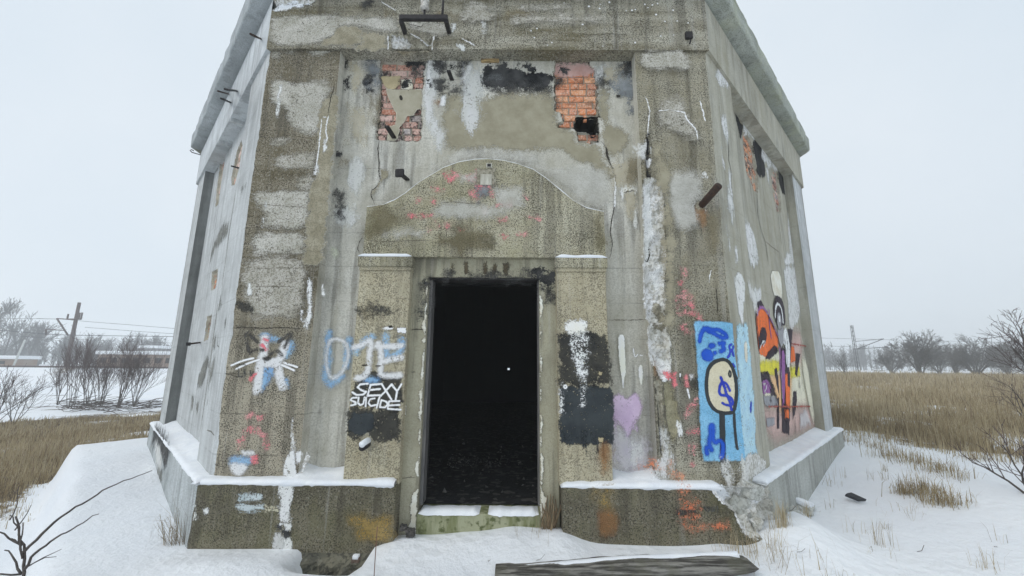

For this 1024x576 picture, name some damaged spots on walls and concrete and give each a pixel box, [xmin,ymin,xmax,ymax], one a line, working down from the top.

flaking render [510,1,604,24]
flaking render [269,0,495,142]
flaking render [553,61,600,144]
water stain [422,38,678,328]
spalling [712,452,775,541]